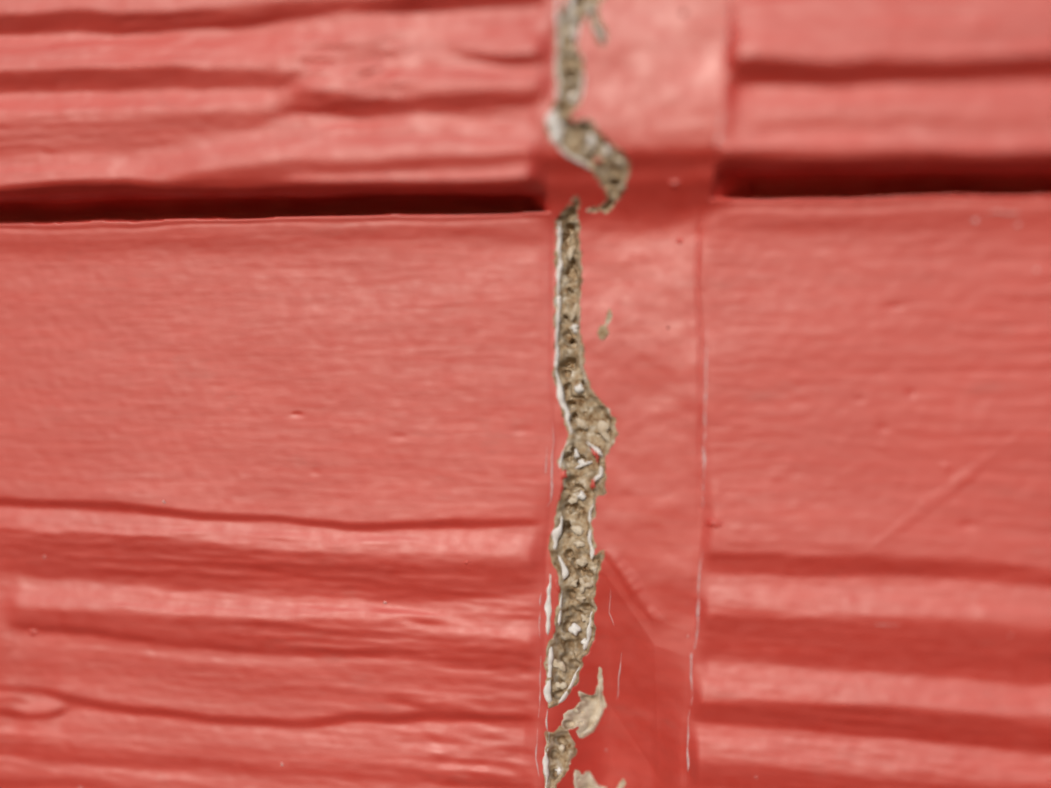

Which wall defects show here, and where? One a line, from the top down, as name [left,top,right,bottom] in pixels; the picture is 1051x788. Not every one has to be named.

peeling [542,0,630,788]